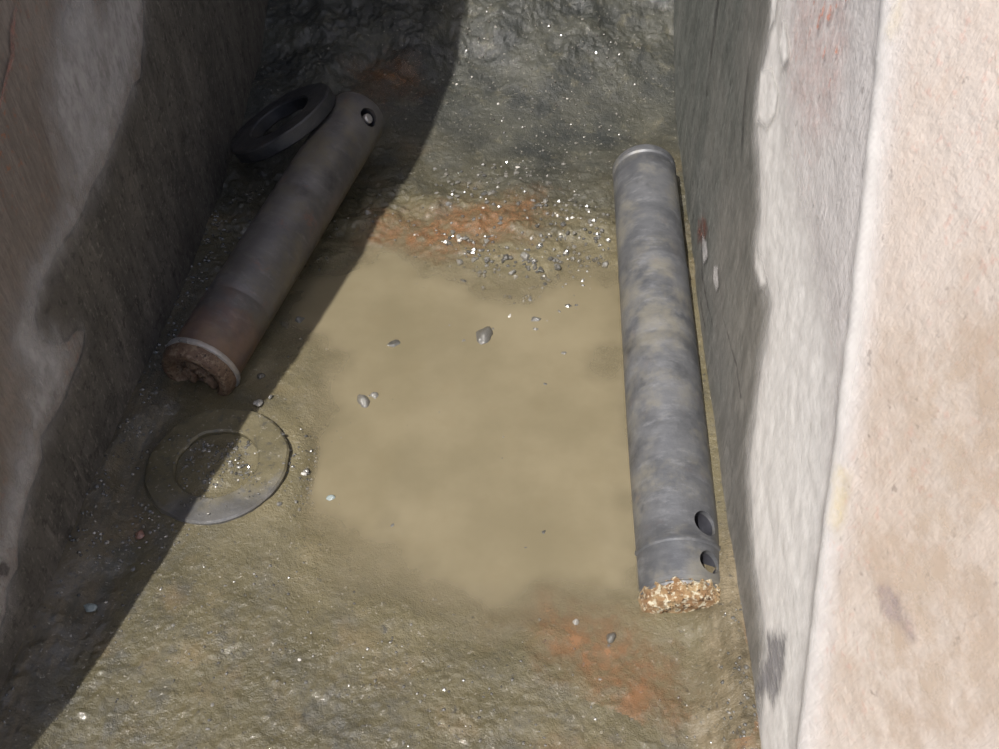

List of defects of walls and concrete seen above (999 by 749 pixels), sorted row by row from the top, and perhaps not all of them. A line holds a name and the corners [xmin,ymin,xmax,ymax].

crack [0,563,10,576]
leakage [673,0,869,749]